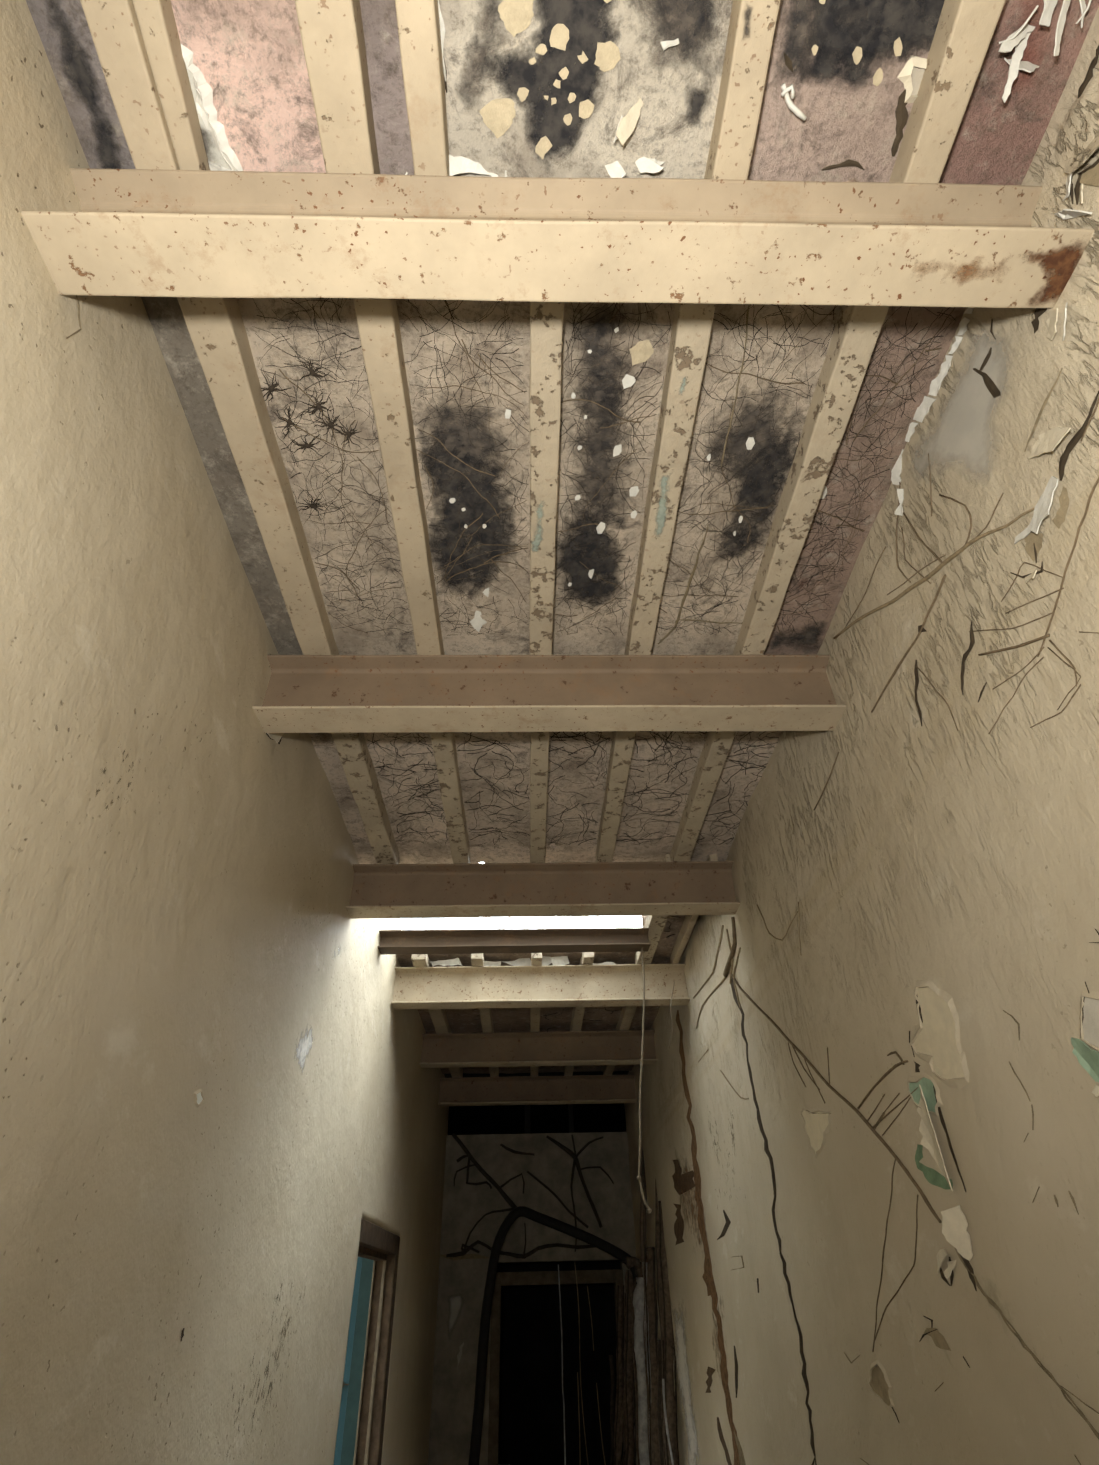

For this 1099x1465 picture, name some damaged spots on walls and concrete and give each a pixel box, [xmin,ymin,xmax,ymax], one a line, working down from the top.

damp [461,0,621,159]
damp [639,0,714,64]
damp [779,0,945,121]
peeling [998,0,1092,103]
crack [1078,45,1099,98]
corrosion [956,263,978,281]
corrosion [1029,243,1083,304]
damp [555,307,629,607]
flaking render [891,307,1006,516]
crack [960,622,987,702]
peeling [908,979,977,1291]
crack [672,978,817,1465]